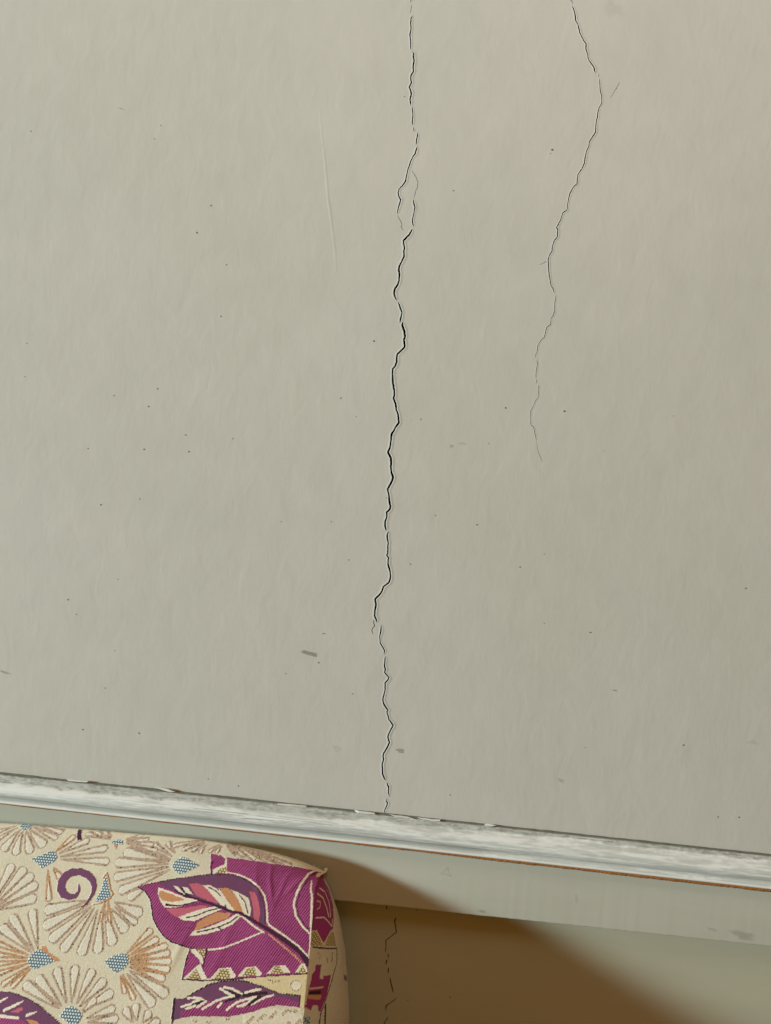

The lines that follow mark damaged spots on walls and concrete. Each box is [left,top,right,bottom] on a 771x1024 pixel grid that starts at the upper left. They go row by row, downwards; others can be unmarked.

crack [372,0,420,813]
crack [529,0,620,460]